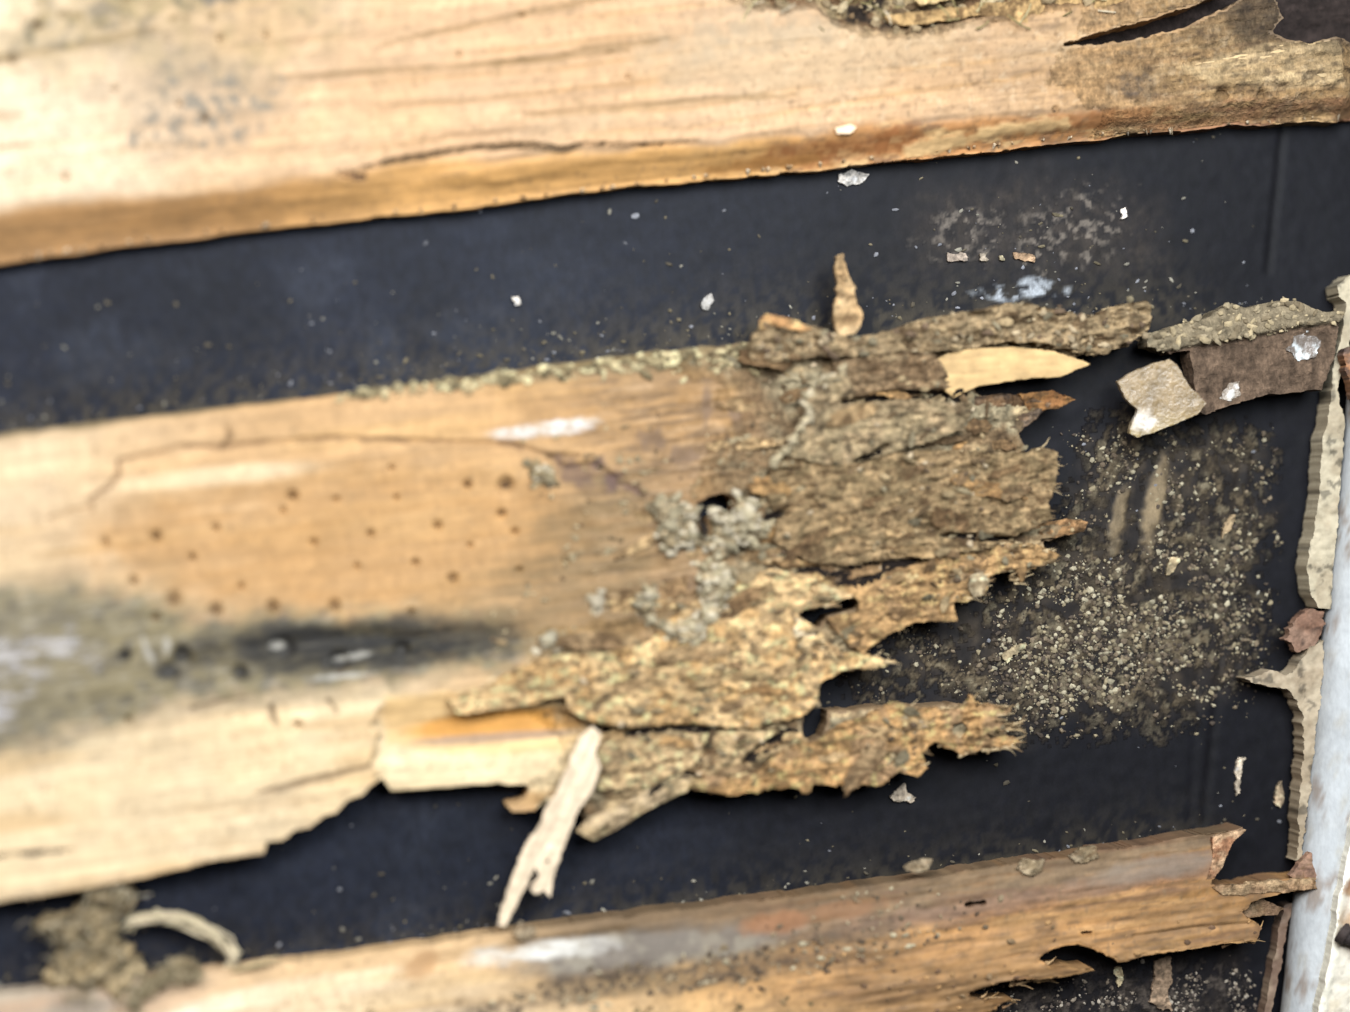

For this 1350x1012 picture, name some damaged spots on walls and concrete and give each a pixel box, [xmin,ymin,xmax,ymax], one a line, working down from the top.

crack [46,425,544,523]
damp [0,439,675,780]
peeling [377,300,1152,841]
peeling [903,858,932,873]
peeling [1015,858,1045,876]
peeling [1068,845,1099,863]
peeling [1207,829,1317,918]